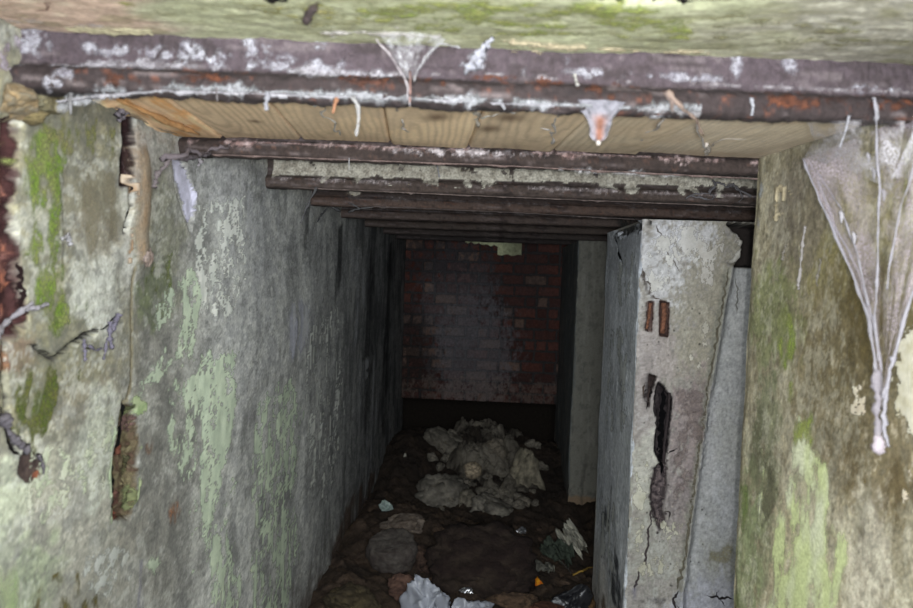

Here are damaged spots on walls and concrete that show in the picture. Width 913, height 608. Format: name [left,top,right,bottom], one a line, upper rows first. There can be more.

water stain [0,19,51,71]
water stain [664,72,719,82]
spalling [119,116,140,196]
corrosion [0,117,29,334]
crack [28,272,134,401]
peeling [108,160,345,608]
spalling [633,390,704,577]
crack [642,271,739,608]
peeling [891,330,913,434]
crack [633,509,652,591]